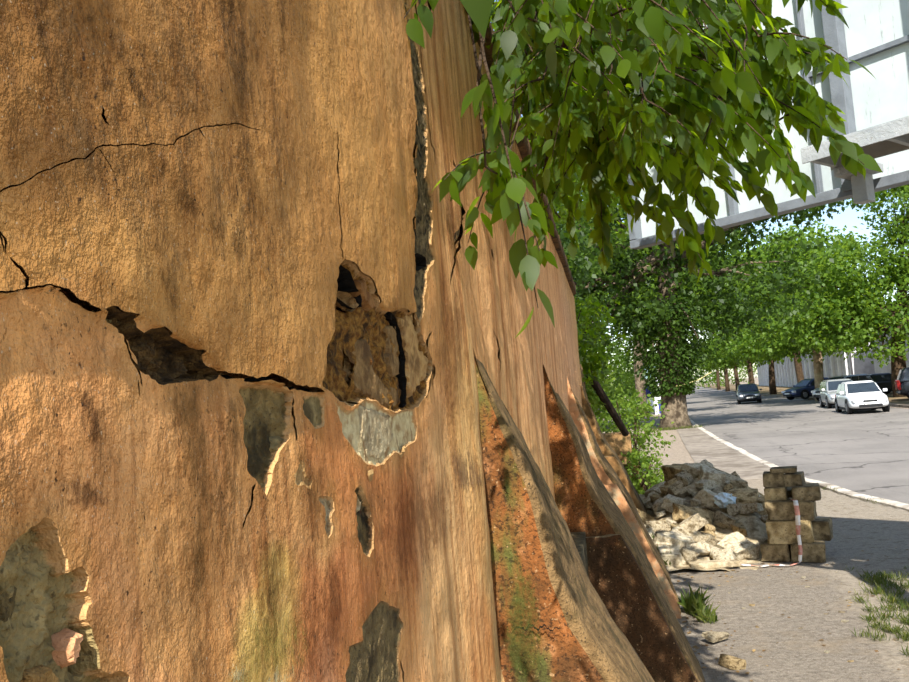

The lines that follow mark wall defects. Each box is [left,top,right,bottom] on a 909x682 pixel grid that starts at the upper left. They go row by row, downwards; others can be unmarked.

crack [221,375,310,392]
flaking render [239,259,433,557]
spalling [0,518,130,682]